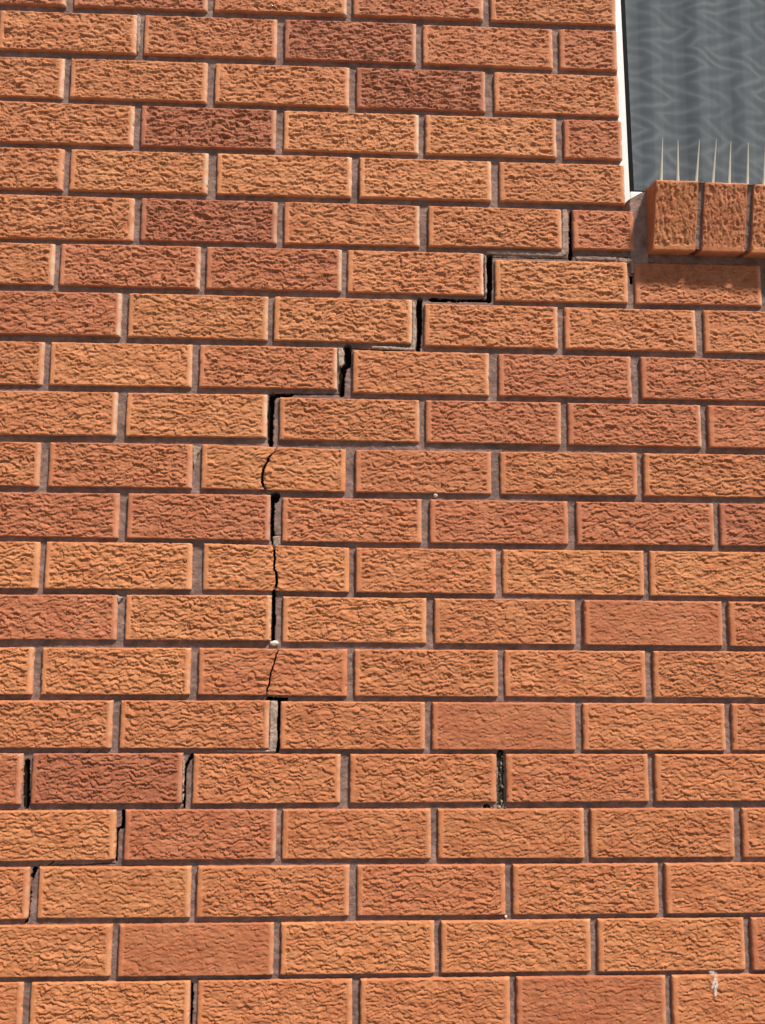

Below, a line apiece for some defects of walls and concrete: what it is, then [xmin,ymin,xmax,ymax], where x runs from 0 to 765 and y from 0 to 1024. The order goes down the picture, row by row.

crack [261,216,573,754]
crack [182,753,194,809]
crack [25,809,126,923]